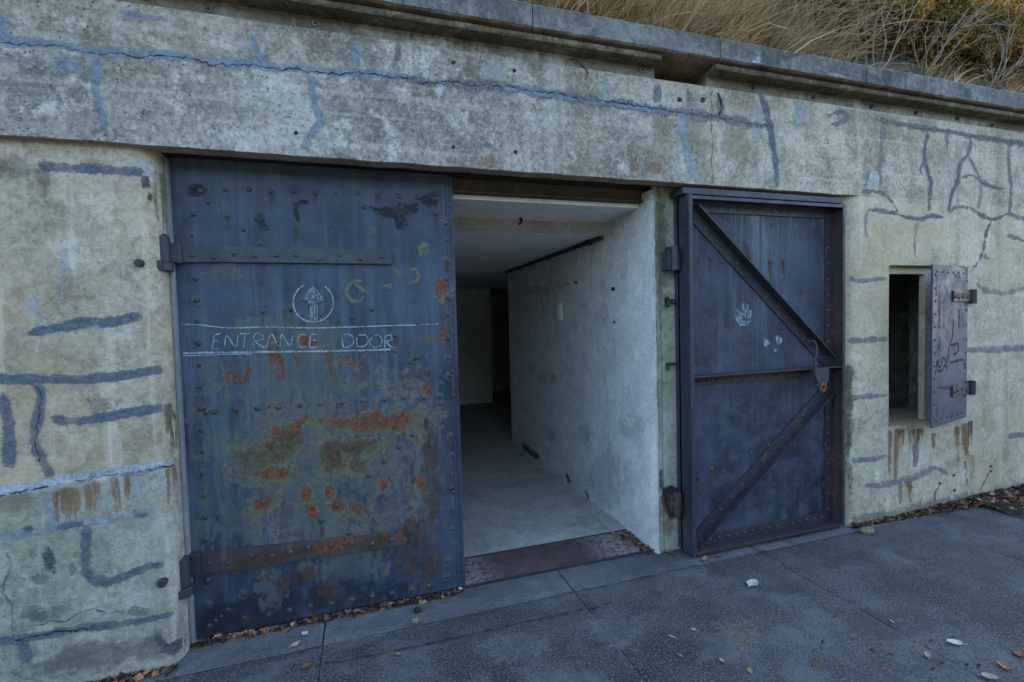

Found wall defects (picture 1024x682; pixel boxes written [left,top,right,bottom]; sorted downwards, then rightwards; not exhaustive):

crack [0,35,780,183]
crack [862,117,1024,295]
rust [225,360,250,389]
rust [267,329,361,380]
rust [888,428,936,480]
rust [954,421,973,463]
crack [0,365,174,667]
rust [53,476,131,522]
rust [231,410,455,610]